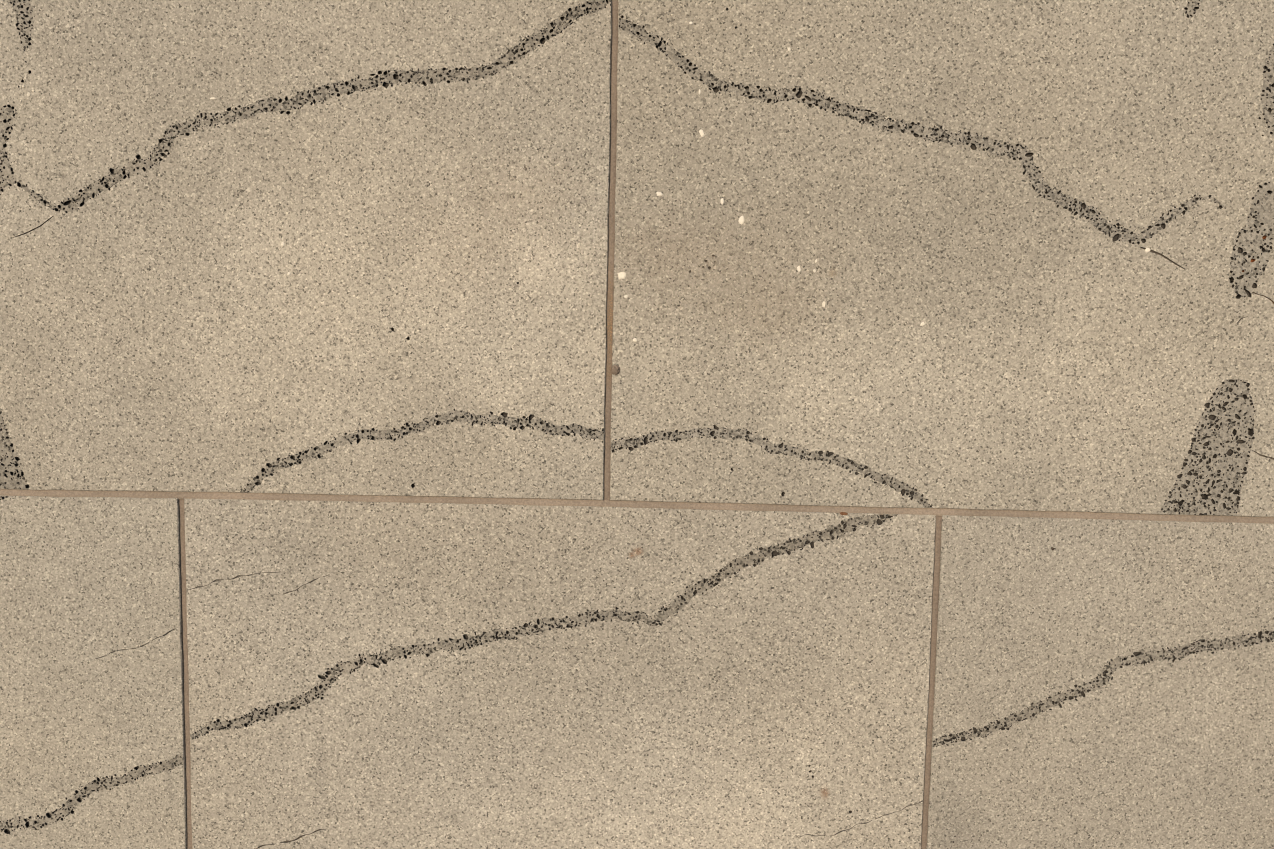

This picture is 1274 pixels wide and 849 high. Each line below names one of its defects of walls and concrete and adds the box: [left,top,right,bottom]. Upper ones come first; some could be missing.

spalling [0,104,21,195]
spalling [10,0,34,88]
crack [12,0,1226,269]
spalling [1255,44,1274,138]
spalling [1229,181,1274,299]
spalling [0,409,29,489]
spalling [1157,379,1256,516]
crack [0,408,933,838]
crack [933,629,1274,747]
crack [256,829,324,849]